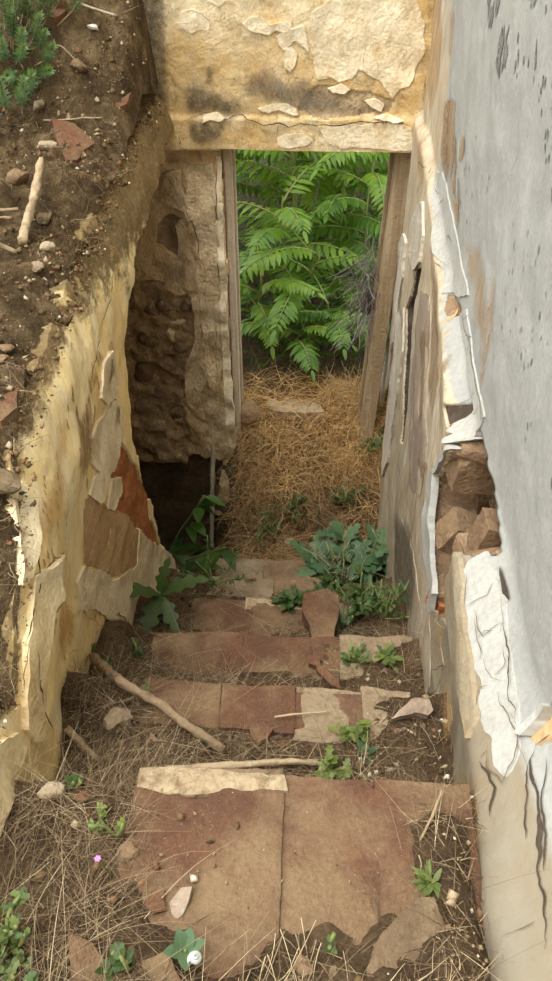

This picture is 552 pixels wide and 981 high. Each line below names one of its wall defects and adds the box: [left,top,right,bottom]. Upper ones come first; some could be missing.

water stain [187,85,238,113]
water stain [249,73,339,108]
peeling [242,0,426,151]
water stain [190,123,223,144]
peeling [202,112,225,123]
crack [179,112,414,145]
spalling [379,100,552,777]
spalling [0,155,237,837]
crack [443,575,550,949]